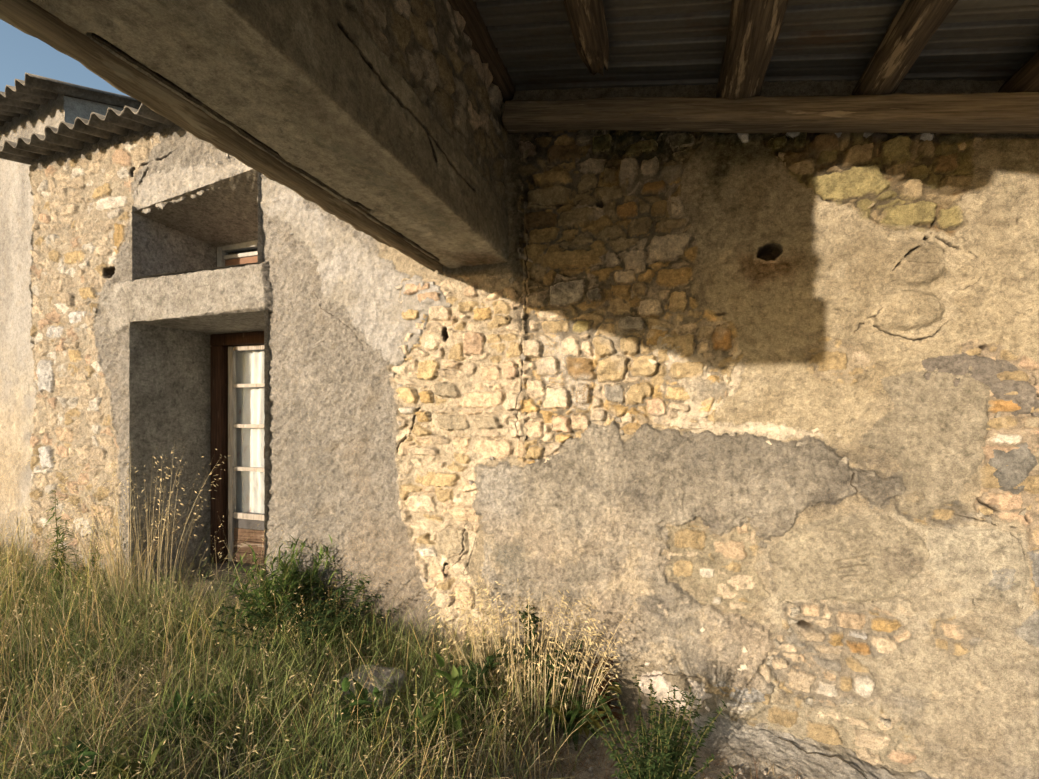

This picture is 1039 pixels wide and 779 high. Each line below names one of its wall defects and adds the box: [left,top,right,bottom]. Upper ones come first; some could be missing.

crack [91,33,440,261]
crack [338,24,476,191]
spalling [761,132,982,236]
spalling [0,132,252,592]
spalling [257,130,840,672]
spalling [892,339,1039,610]
spalling [639,599,932,765]
crack [777,737,867,779]
spalling [925,598,987,657]